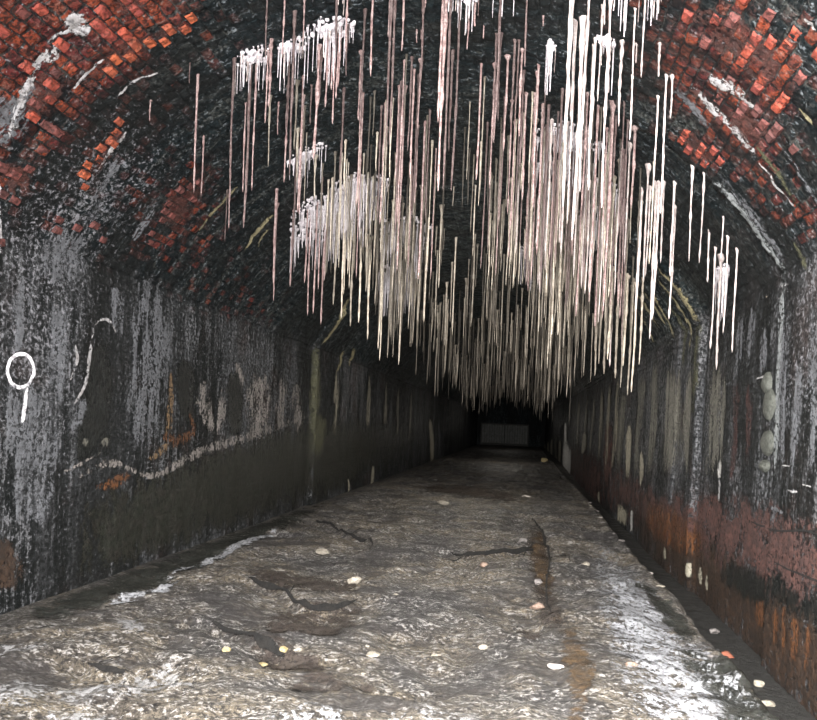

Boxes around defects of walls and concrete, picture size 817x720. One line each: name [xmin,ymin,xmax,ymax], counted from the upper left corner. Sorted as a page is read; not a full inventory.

efflorescence [0,11,91,144]
spalling [78,0,198,86]
efflorescence [235,0,356,93]
damp [545,39,557,95]
spalling [681,8,802,152]
spalling [676,127,725,168]
damp [1,275,441,620]
crack [248,576,359,611]
crack [316,520,373,549]
crack [448,518,570,612]
corrosion [569,423,817,720]
corrosion [558,627,596,720]